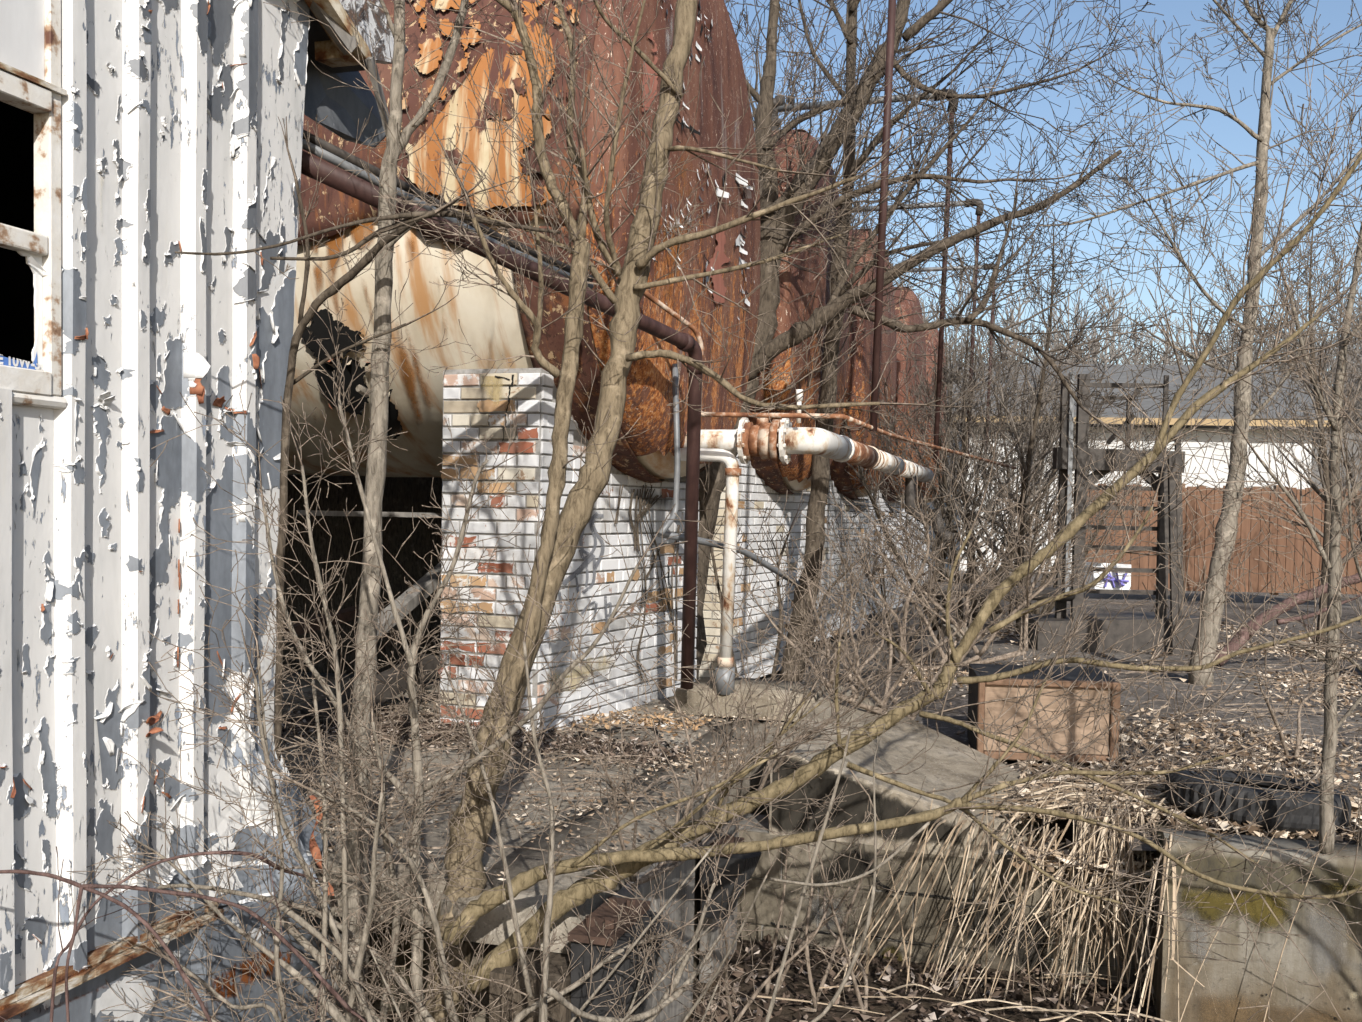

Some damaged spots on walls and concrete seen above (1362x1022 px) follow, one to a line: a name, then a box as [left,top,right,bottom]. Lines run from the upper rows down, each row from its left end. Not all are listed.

peeling [275,0,310,87]
rust [484,77,527,121]
rust [445,148,462,164]
rust [520,149,548,174]
rust [314,222,374,287]
peeling [652,163,758,320]
rust [401,348,431,419]
peeling [18,139,323,972]
peeling [0,716,62,821]
peeling [12,839,51,892]
peeling [0,915,47,997]
peeling [90,976,155,1022]